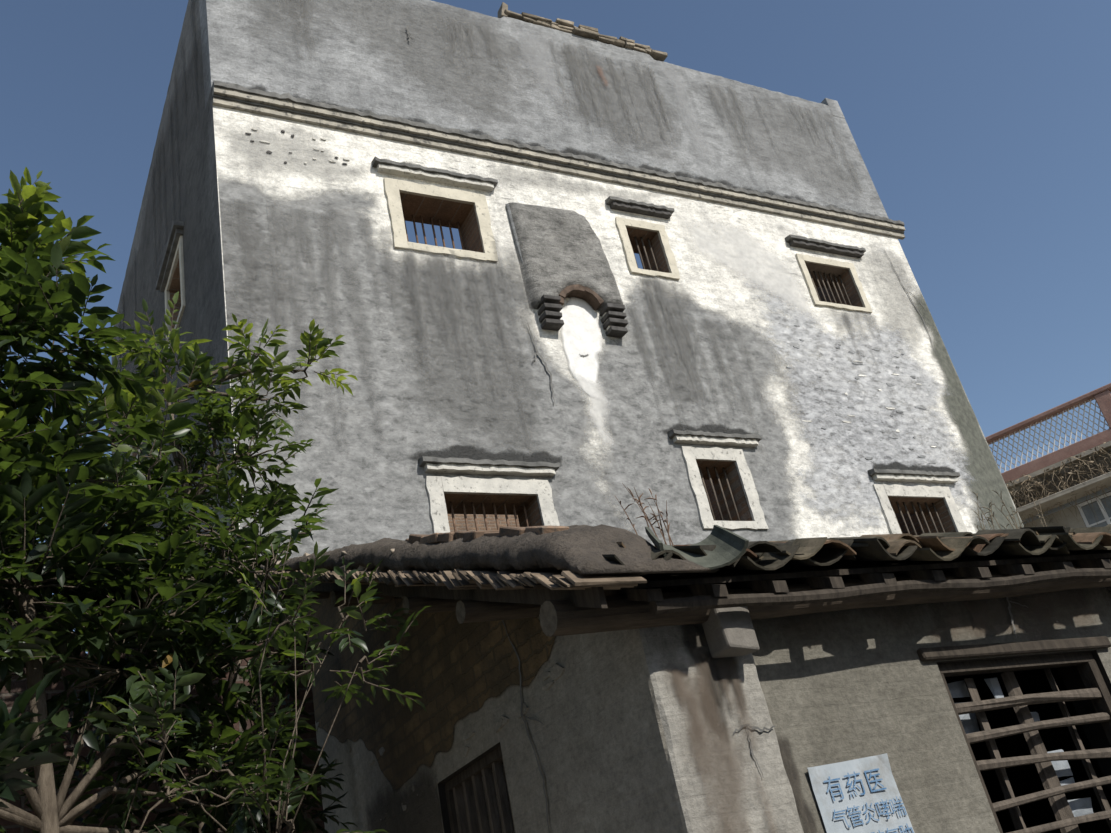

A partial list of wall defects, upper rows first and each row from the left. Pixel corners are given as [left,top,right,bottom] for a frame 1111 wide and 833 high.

water stain [559,147,877,216]
water stain [218,178,809,558]
spalling [560,297,608,440]
water stain [873,461,955,473]
spalling [274,592,565,796]